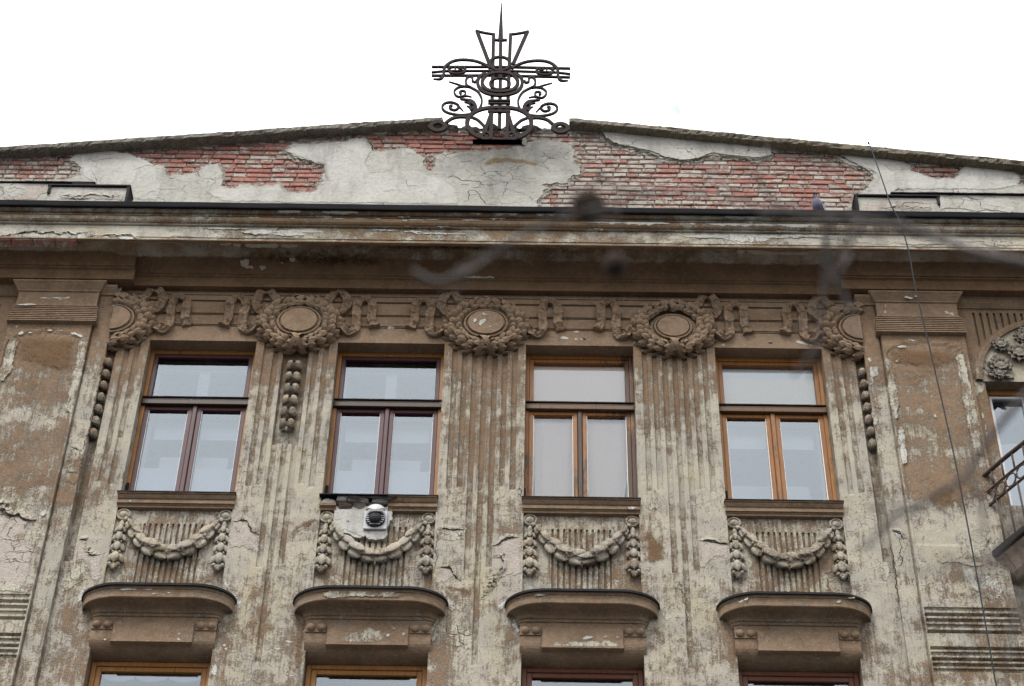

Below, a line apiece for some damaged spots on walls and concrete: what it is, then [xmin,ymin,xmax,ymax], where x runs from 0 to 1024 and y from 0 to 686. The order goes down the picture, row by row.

flaking render [0,155,123,200]
crack [445,158,492,205]
flaking render [119,123,1024,246]
flaking render [0,229,139,248]
peeling [200,210,358,270]
flaking render [0,325,33,381]
flaking render [48,329,106,413]
flaking render [866,339,916,463]
flaking render [956,354,987,453]
flaking render [64,444,84,484]
spalling [0,499,46,594]
spalling [60,536,108,602]